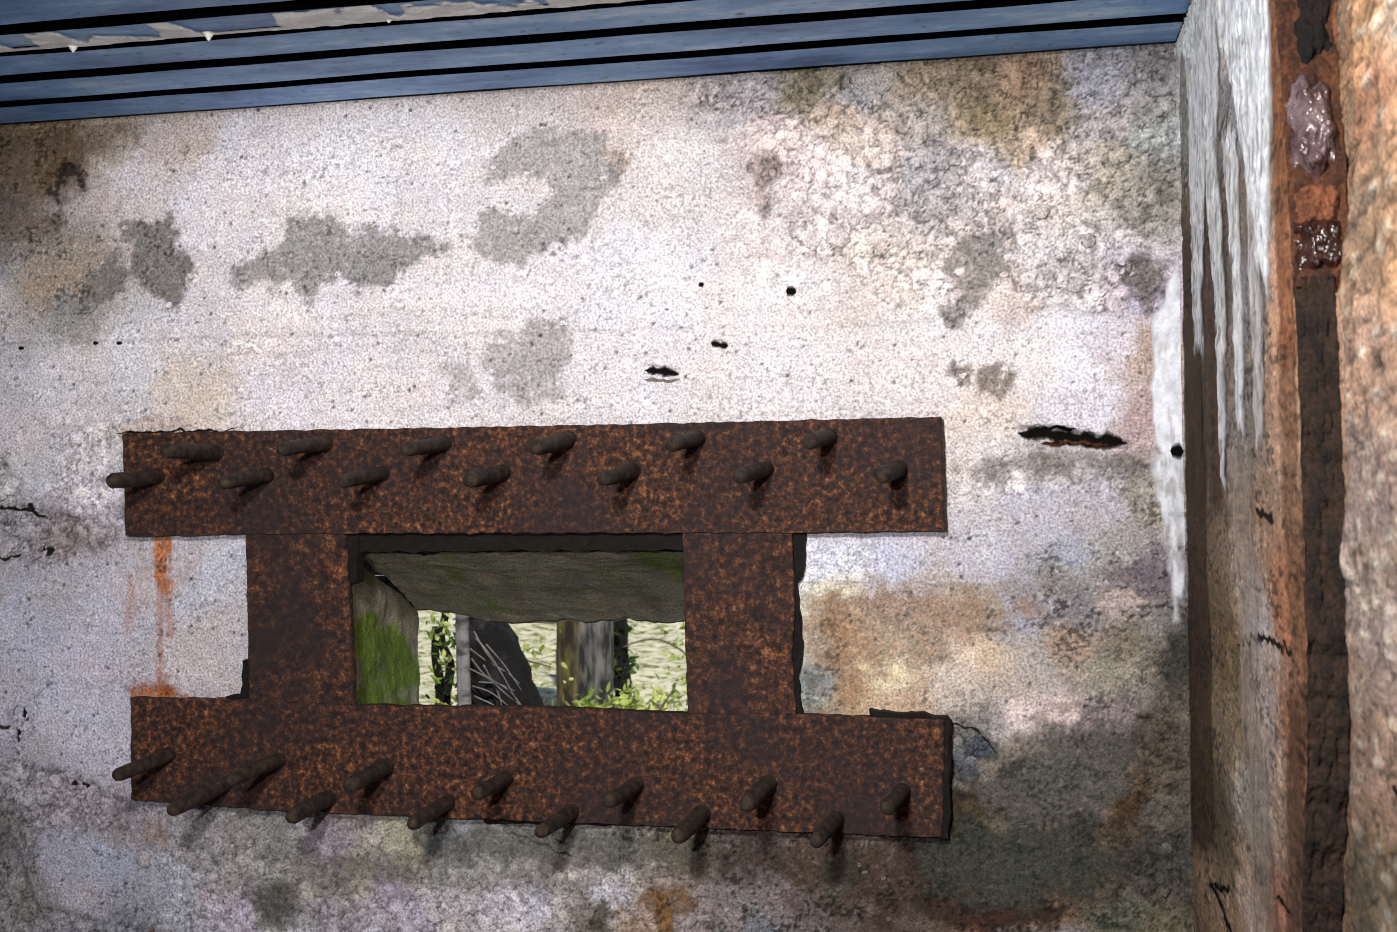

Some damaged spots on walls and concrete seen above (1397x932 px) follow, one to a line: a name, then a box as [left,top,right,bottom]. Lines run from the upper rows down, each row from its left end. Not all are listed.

damp [0,0,639,53]
damp [47,162,87,202]
damp [1152,0,1271,602]
corrosion [1268,0,1349,932]
corrosion [154,536,171,594]
corrosion [804,595,1036,706]
corrosion [130,685,187,697]
corrosion [654,893,672,932]
crack [1209,881,1232,932]